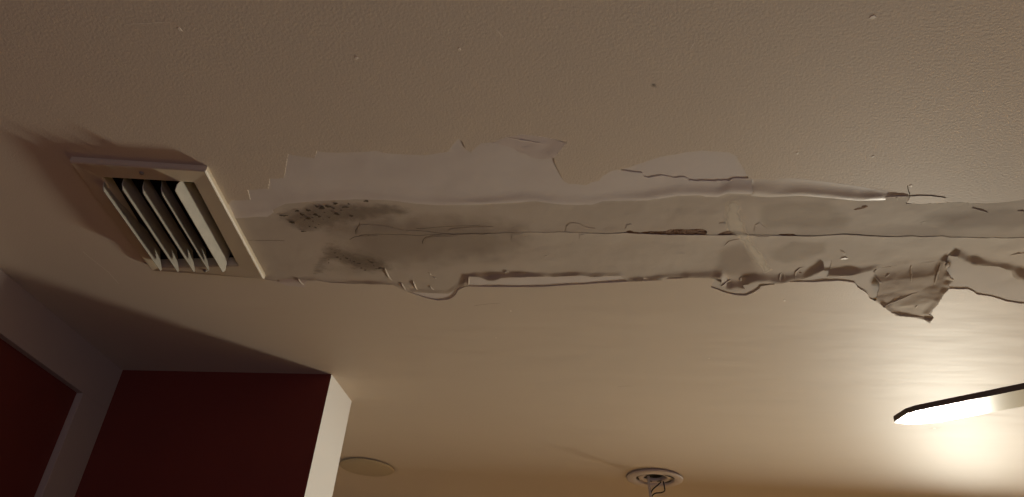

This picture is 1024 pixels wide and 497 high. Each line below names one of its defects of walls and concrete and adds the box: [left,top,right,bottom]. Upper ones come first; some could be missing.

peeling [229,139,753,218]
peeling [907,185,945,204]
damp [235,193,1024,294]
crack [624,222,796,242]
peeling [411,276,627,300]
peeling [711,279,771,295]
peeling [792,257,880,304]
peeling [946,256,1024,303]